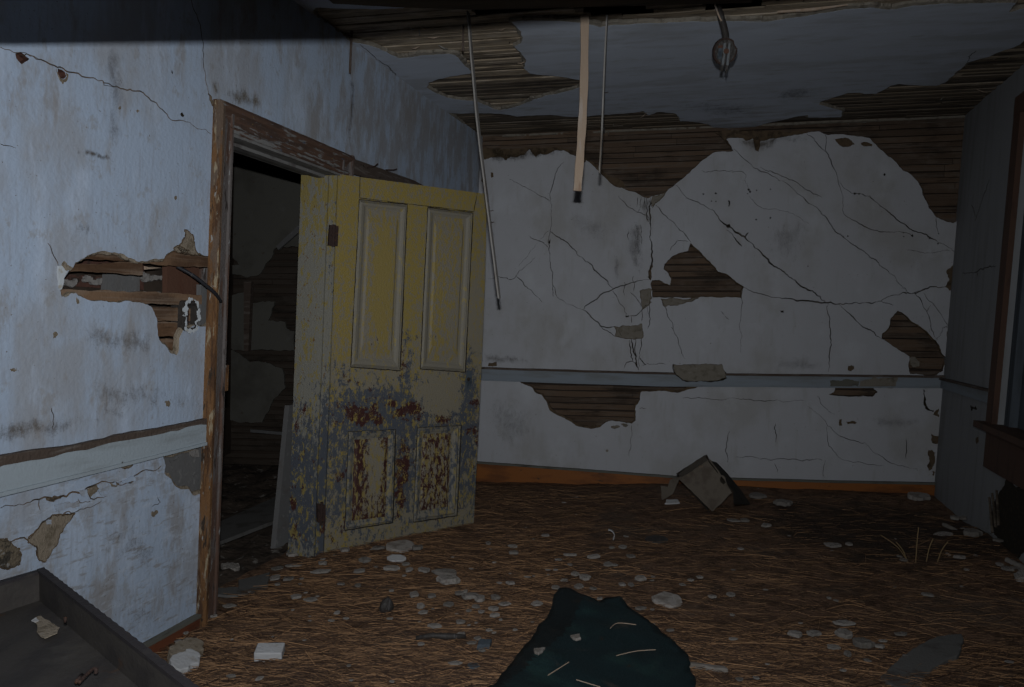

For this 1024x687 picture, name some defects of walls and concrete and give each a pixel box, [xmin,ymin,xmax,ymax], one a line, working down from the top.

crack [1,47,209,133]
spalling [313,0,1024,223]
spalling [56,229,208,355]
spalling [639,243,744,309]
crack [492,134,995,371]
spalling [521,364,727,429]
spalling [829,311,945,397]
spalling [0,495,76,570]
crack [0,466,161,542]
spalling [163,447,202,496]